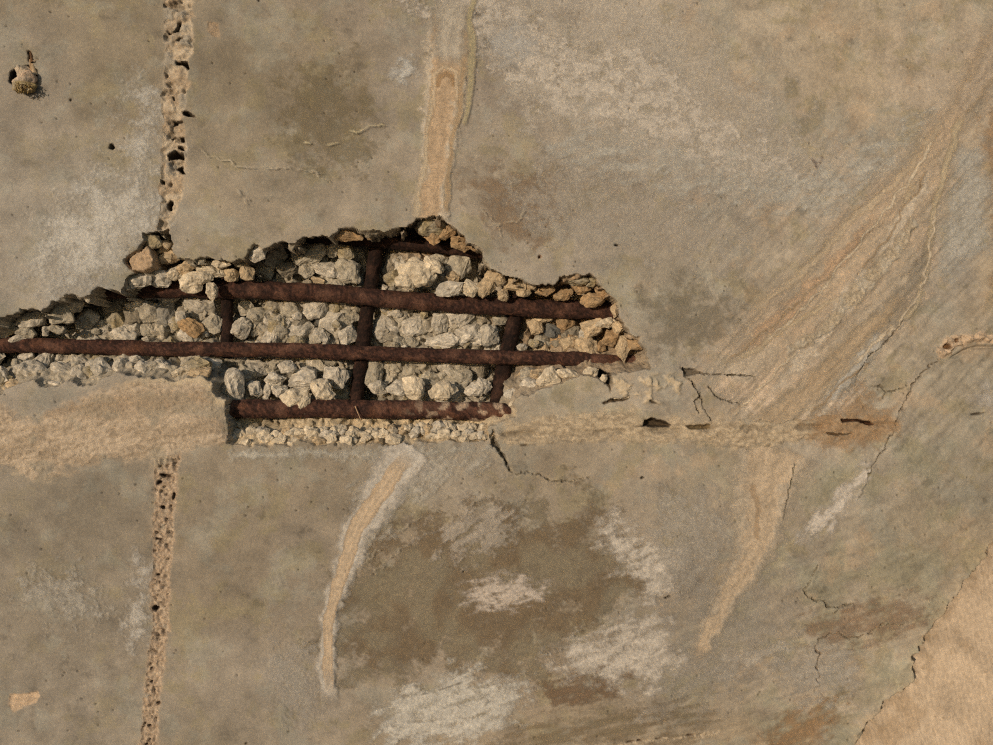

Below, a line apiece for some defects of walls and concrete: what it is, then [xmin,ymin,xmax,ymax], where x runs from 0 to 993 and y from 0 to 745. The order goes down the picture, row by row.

leakage [389,0,993,424]
spalling [0,215,651,448]
crack [680,367,755,422]
crack [854,321,939,500]
leakage [232,442,927,745]
crack [802,564,903,682]